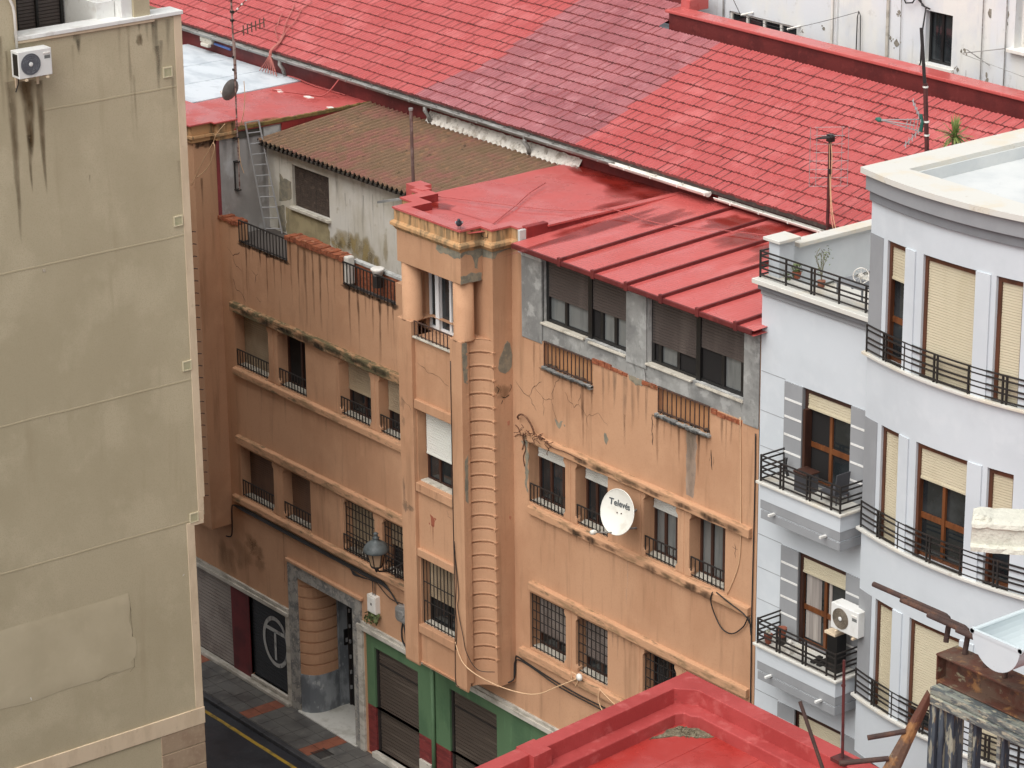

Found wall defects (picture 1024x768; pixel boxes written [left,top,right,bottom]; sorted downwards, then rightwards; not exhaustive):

damp [13,80,44,156]
damp [239,242,289,264]
damp [343,285,397,312]
damp [241,310,337,355]
peeling [496,341,512,404]
damp [653,415,707,442]